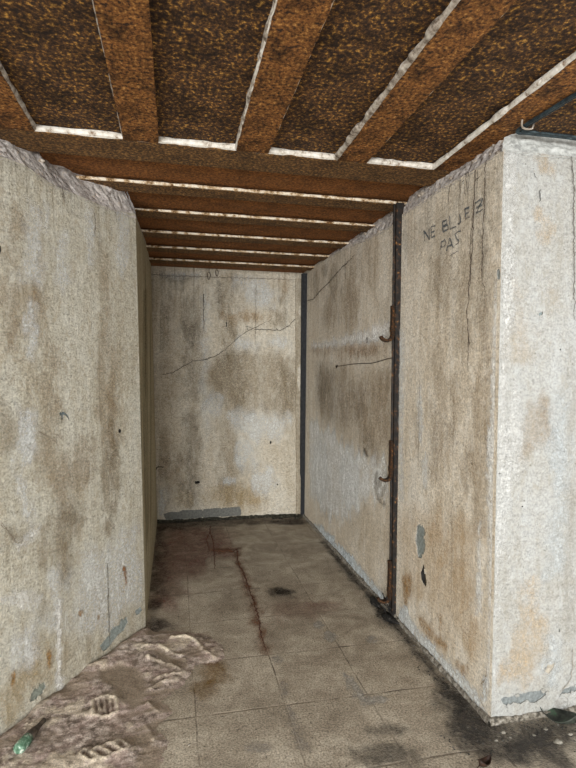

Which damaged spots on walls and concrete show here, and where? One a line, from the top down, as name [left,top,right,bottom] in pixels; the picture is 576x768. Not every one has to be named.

crack [448,165,486,371]
crack [153,274,295,375]
damp [476,205,522,613]
spalling [414,523,426,558]
peeling [99,618,127,653]
damp [399,606,496,708]
peeling [501,689,549,709]